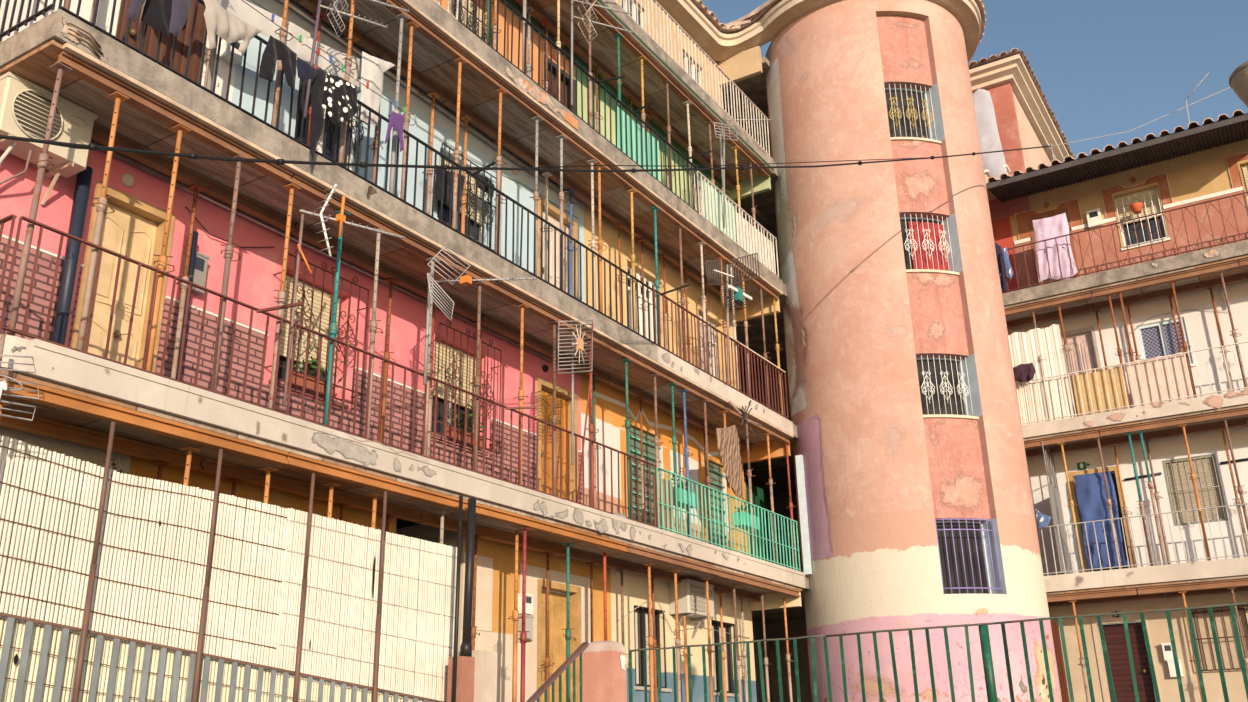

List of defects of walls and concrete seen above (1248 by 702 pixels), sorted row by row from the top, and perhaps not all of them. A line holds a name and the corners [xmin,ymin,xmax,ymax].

peeling [312,432,378,467]
peeling [394,458,437,477]
peeling [534,500,692,556]
peeling [860,679,894,694]
peeling [1019,638,1056,702]